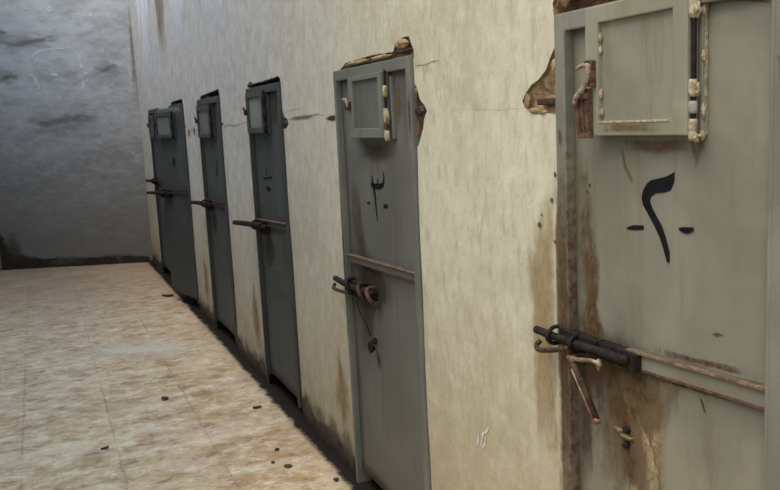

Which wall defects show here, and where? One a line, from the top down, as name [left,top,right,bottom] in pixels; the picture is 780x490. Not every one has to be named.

flaking render [344,37,414,69]
flaking render [524,55,556,114]
crack [288,108,323,120]
flaking render [414,88,427,136]
leakage [0,234,163,272]
rust [557,204,567,329]
rust [559,343,570,462]